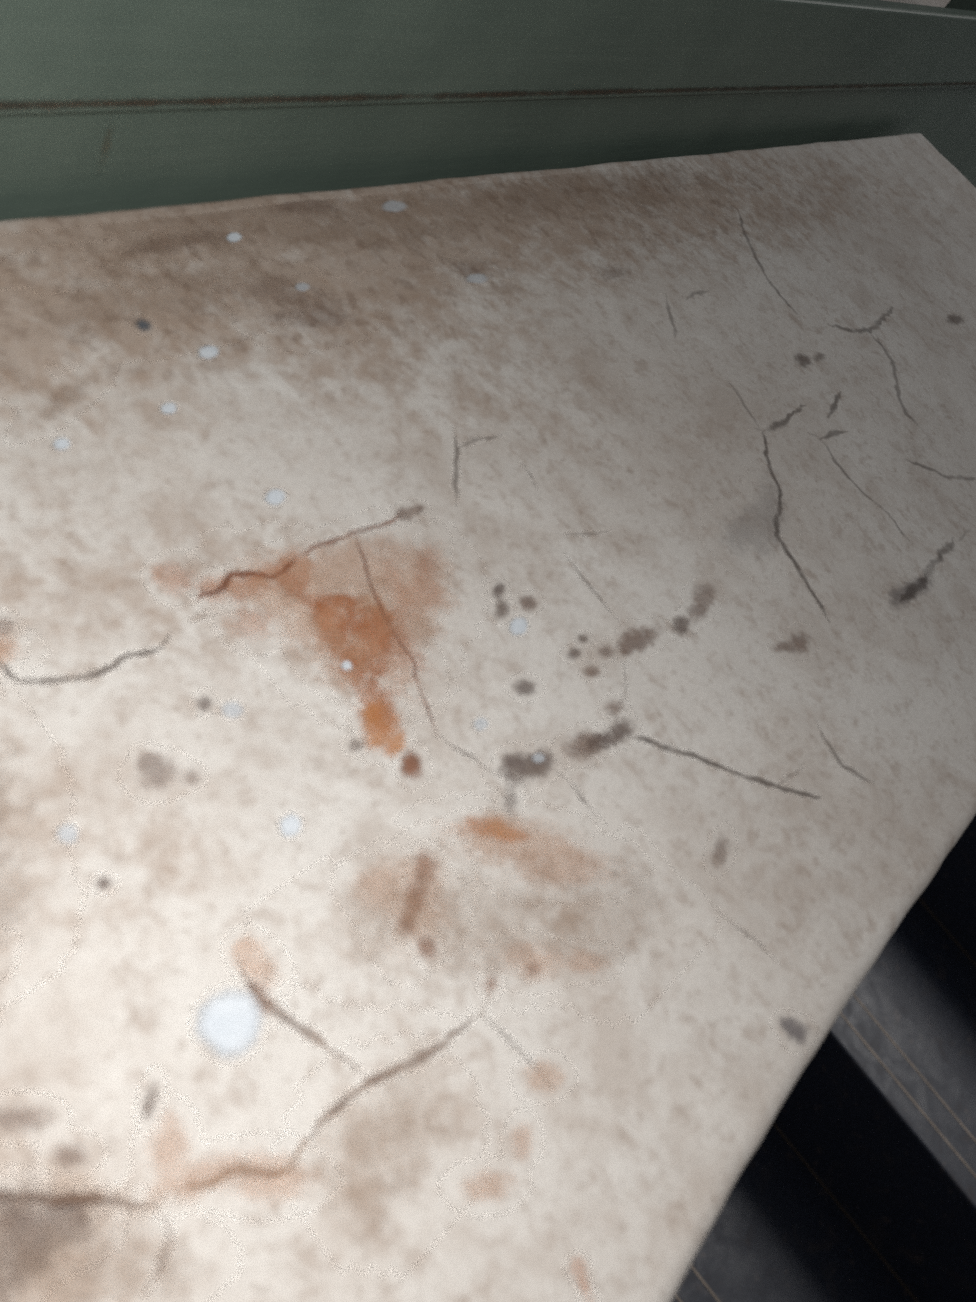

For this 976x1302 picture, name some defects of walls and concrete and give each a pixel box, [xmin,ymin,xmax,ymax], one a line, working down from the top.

crack [764,439,823,608]
crack [198,563,291,598]
damp [495,586,506,615]
corrosion [316,596,391,665]
crack [0,647,160,683]
corrosion [366,704,420,774]
damp [594,724,630,747]
damp [504,753,549,779]
crack [645,738,814,797]
crack [329,1031,457,1115]
crack [32,1194,134,1207]